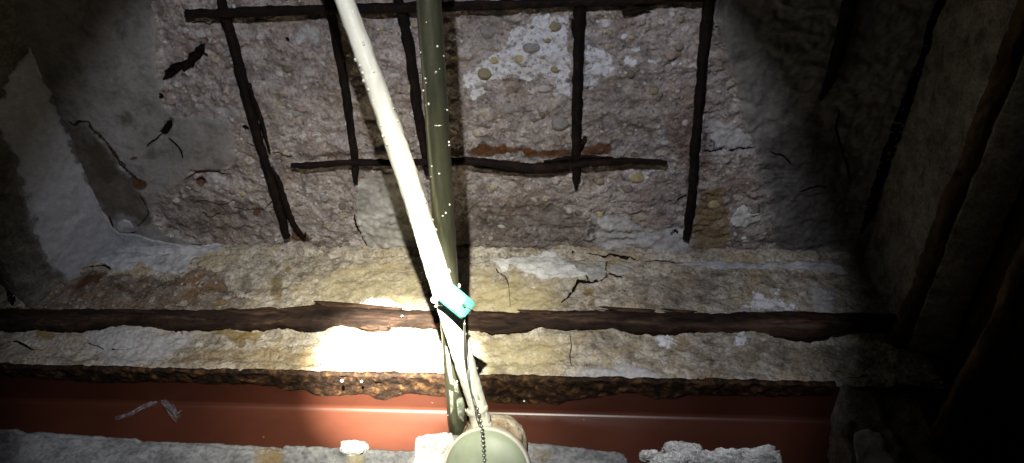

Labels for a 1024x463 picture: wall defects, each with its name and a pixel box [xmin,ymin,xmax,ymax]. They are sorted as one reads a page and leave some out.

leakage [462,12,657,100]
crack [68,120,149,234]
spalling [0,0,418,311]
spalling [355,0,432,216]
rust [467,136,611,174]
spalling [441,0,848,280]
rust [314,301,403,310]
crack [561,251,701,303]
rust [584,290,698,314]